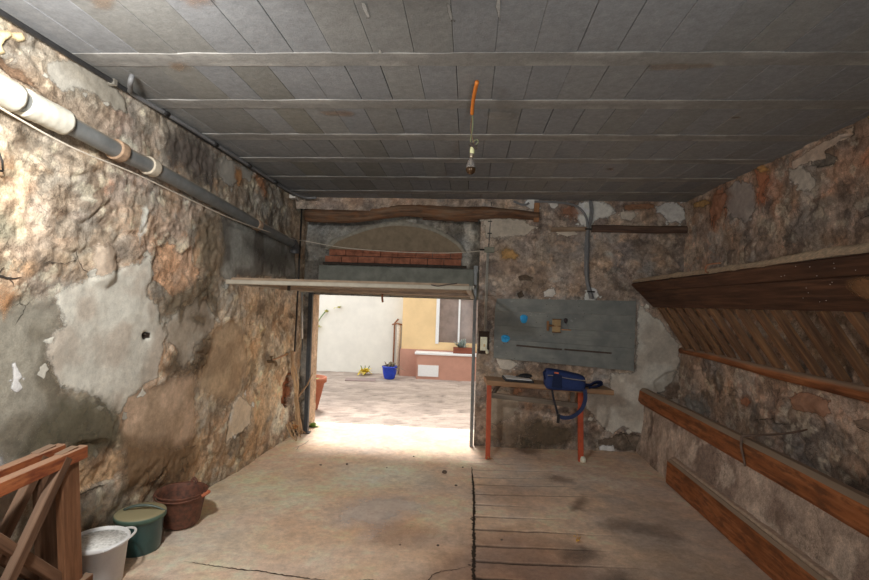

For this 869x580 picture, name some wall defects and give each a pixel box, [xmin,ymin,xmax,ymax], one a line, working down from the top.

spalling [0,30,36,91]
crack [0,267,29,322]
leakage [10,363,24,392]
peeling [37,363,49,379]
leakage [26,402,196,494]
leakage [0,490,16,524]
crack [428,467,476,580]
crack [185,561,321,580]